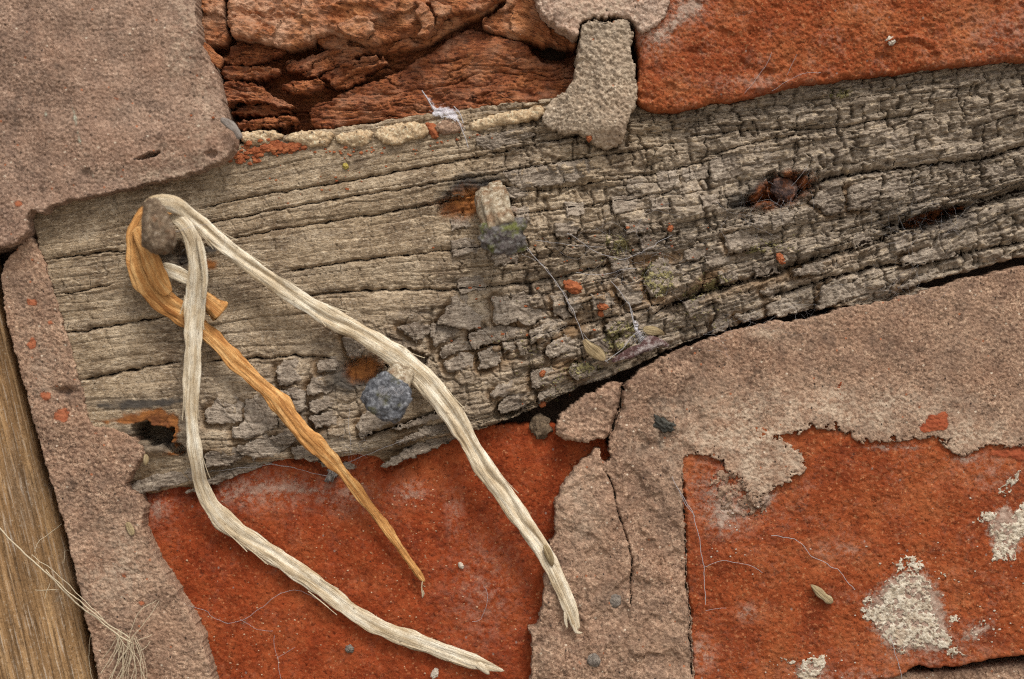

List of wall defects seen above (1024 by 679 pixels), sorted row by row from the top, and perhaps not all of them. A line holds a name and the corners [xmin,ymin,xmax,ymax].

peeling [920,411,948,433]
crack [603,381,633,606]
peeling [977,511,997,523]
peeling [990,446,1024,497]
peeling [892,554,924,573]
damp [867,573,949,651]